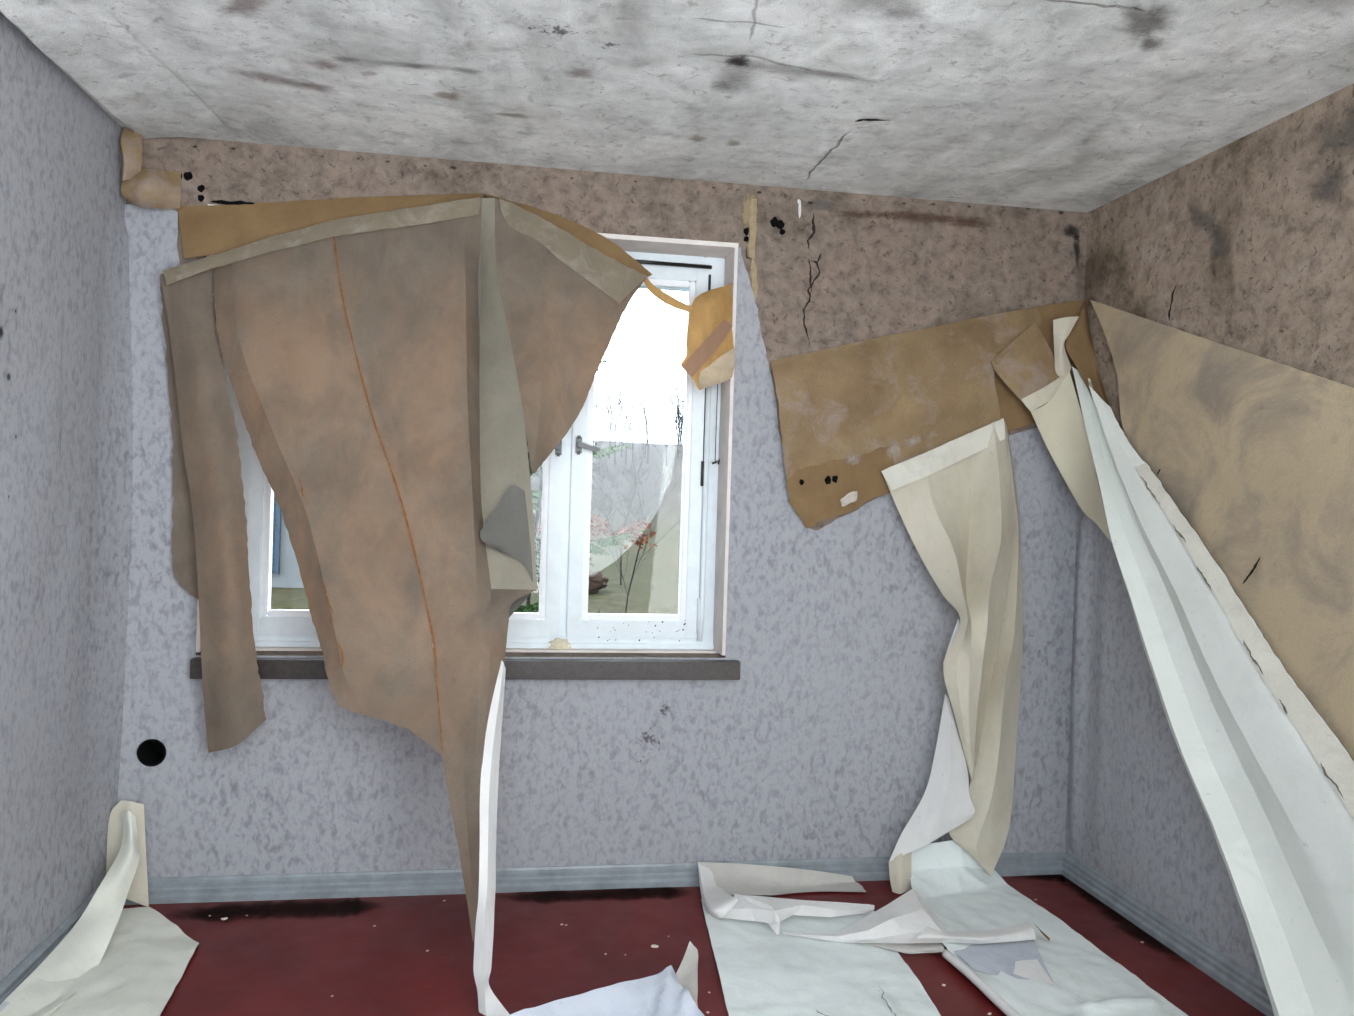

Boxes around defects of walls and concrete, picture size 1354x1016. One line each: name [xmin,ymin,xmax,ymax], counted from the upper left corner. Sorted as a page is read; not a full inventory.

water stain [1130,10,1161,48]
water stain [729,57,747,66]
crack [808,119,887,178]
peeling [141,83,1354,442]
crack [803,213,821,348]
water stain [1059,211,1080,263]
peeling [803,491,880,531]
spalling [137,739,166,767]